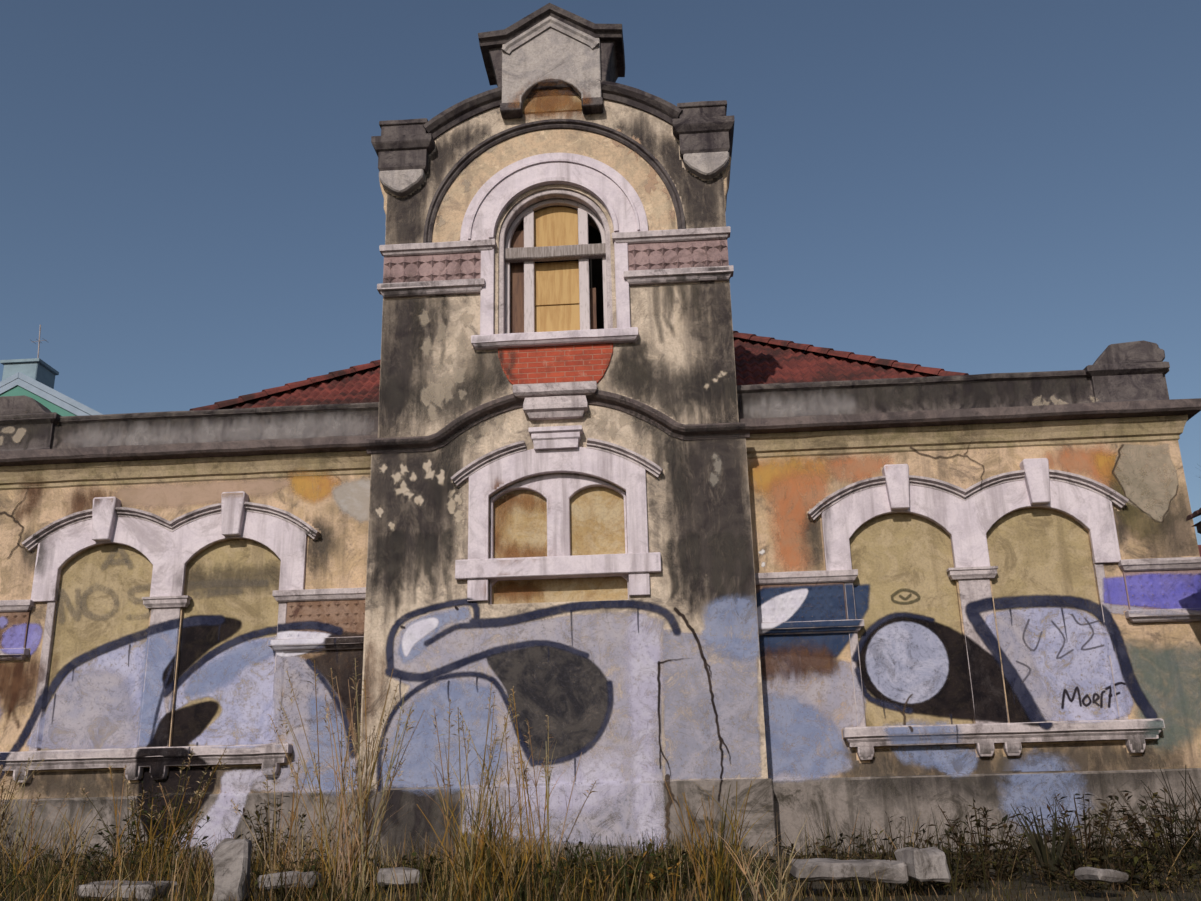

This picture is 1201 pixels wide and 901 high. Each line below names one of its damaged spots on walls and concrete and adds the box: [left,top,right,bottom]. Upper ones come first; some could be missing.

crack [0,489,28,558]
peeling [115,473,395,530]
flaking render [380,460,464,523]
water stain [368,284,527,609]
water stain [586,266,756,615]
crack [657,607,731,841]